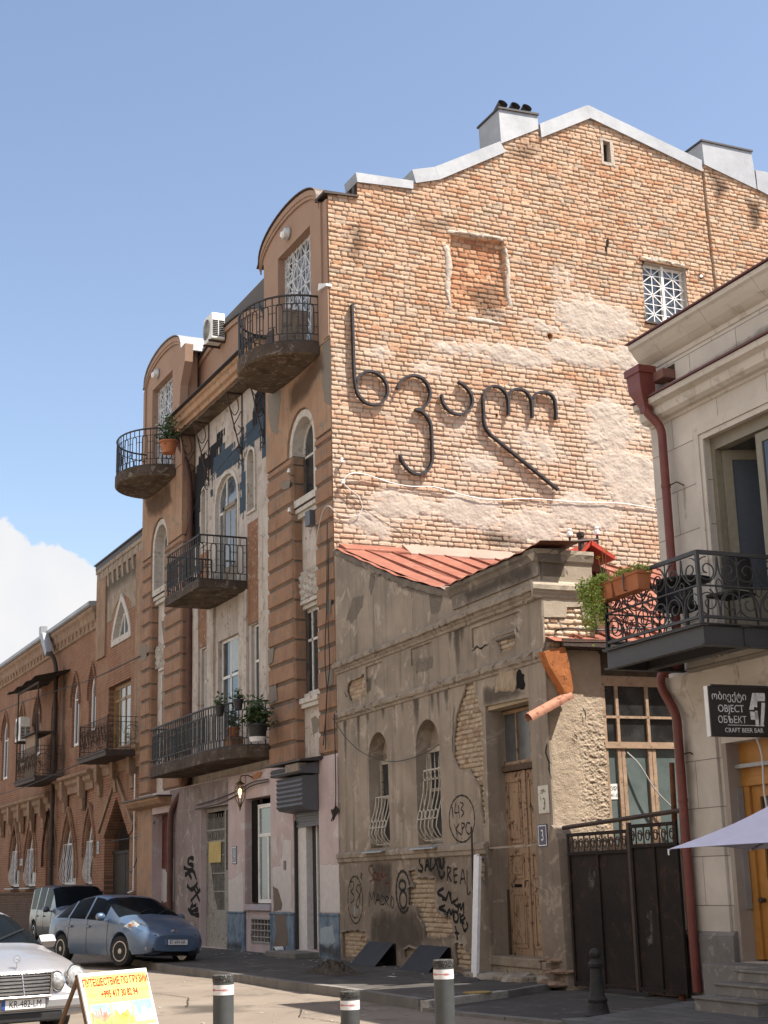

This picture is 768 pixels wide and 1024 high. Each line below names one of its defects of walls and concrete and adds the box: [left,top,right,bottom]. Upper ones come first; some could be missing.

spalling [495,669,525,693]
spalling [452,682,487,827]
peeling [320,864,369,960]
spalling [402,866,472,972]